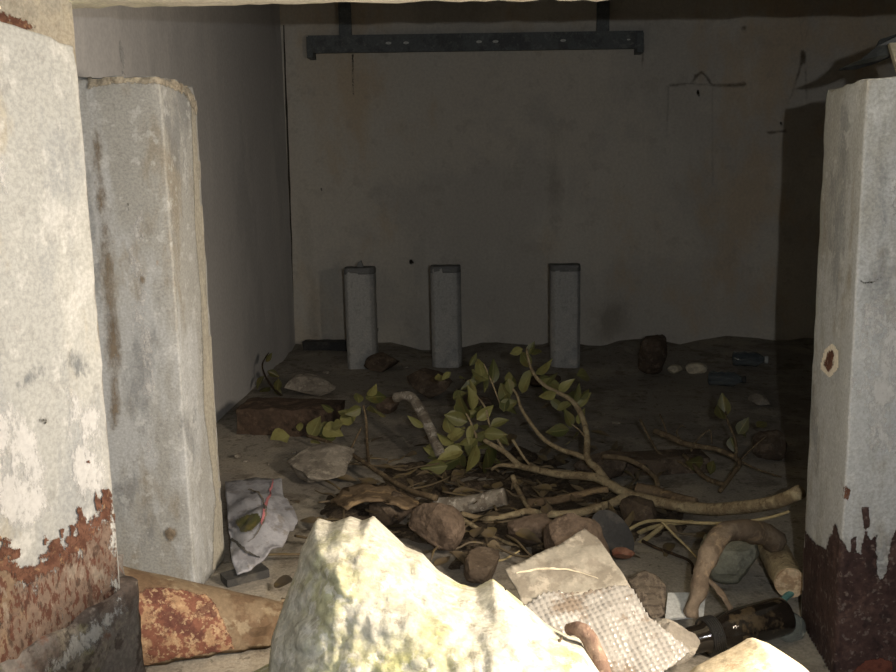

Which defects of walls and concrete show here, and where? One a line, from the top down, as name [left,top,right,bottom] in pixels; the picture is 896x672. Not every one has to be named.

corrosion [0,11,36,30]
leakage [102,244,120,359]
leakage [111,377,119,424]
corrosion [0,489,119,663]